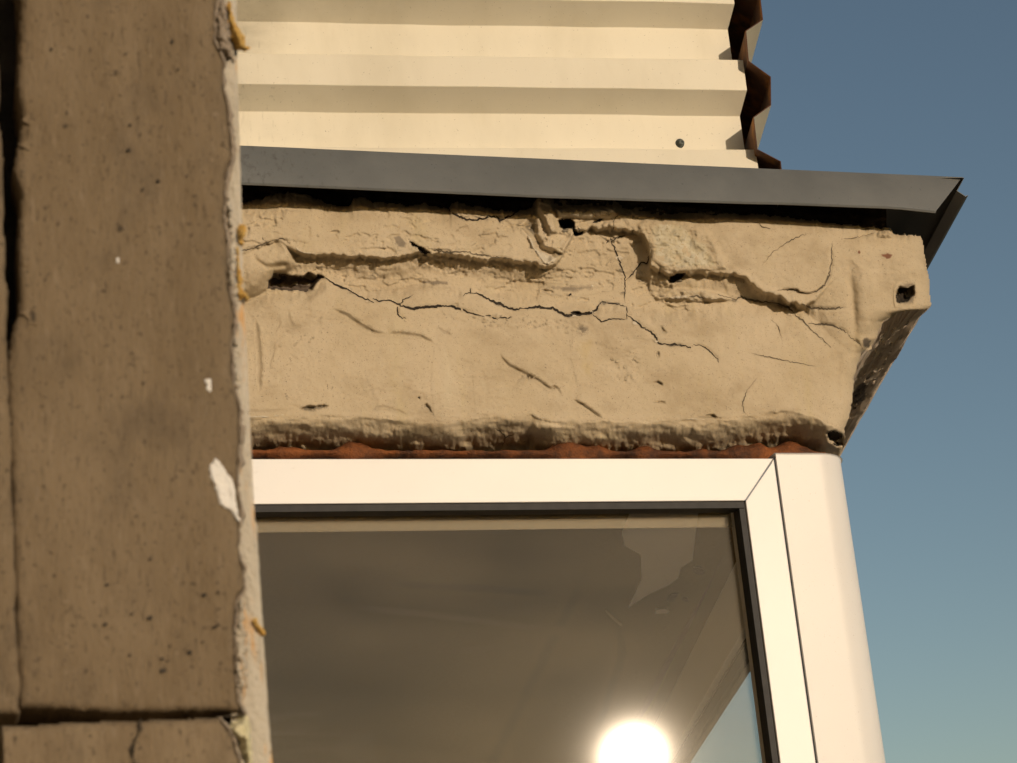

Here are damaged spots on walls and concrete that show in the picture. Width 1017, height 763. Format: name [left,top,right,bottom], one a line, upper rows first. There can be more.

hole [268,273,324,292]
crack [446,207,517,222]
crack [325,216,719,362]
spalling [553,198,733,283]
crack [689,233,873,366]
spalling [896,286,914,303]